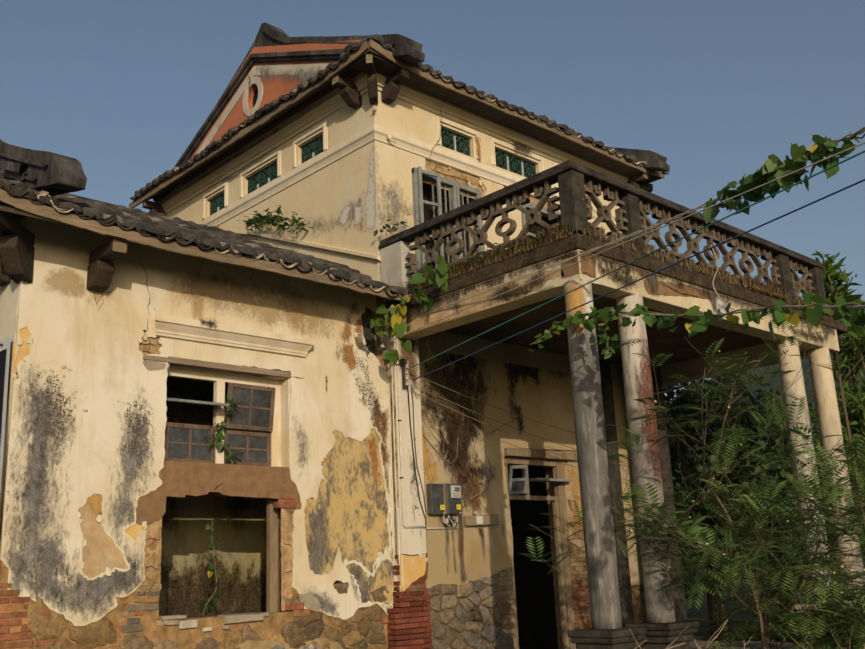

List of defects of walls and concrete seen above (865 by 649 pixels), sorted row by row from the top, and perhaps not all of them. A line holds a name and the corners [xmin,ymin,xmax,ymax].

flaking render [340,146,383,229]
flaking render [13,327,33,385]
crack [140,257,156,333]
spalling [137,334,168,362]
flaking render [404,250,596,334]
damp [405,251,772,324]
damp [782,318,835,344]
damp [7,364,139,615]
damp [109,401,154,537]
damp [337,338,496,560]
corrosion [637,342,662,480]
spalling [0,428,516,649]